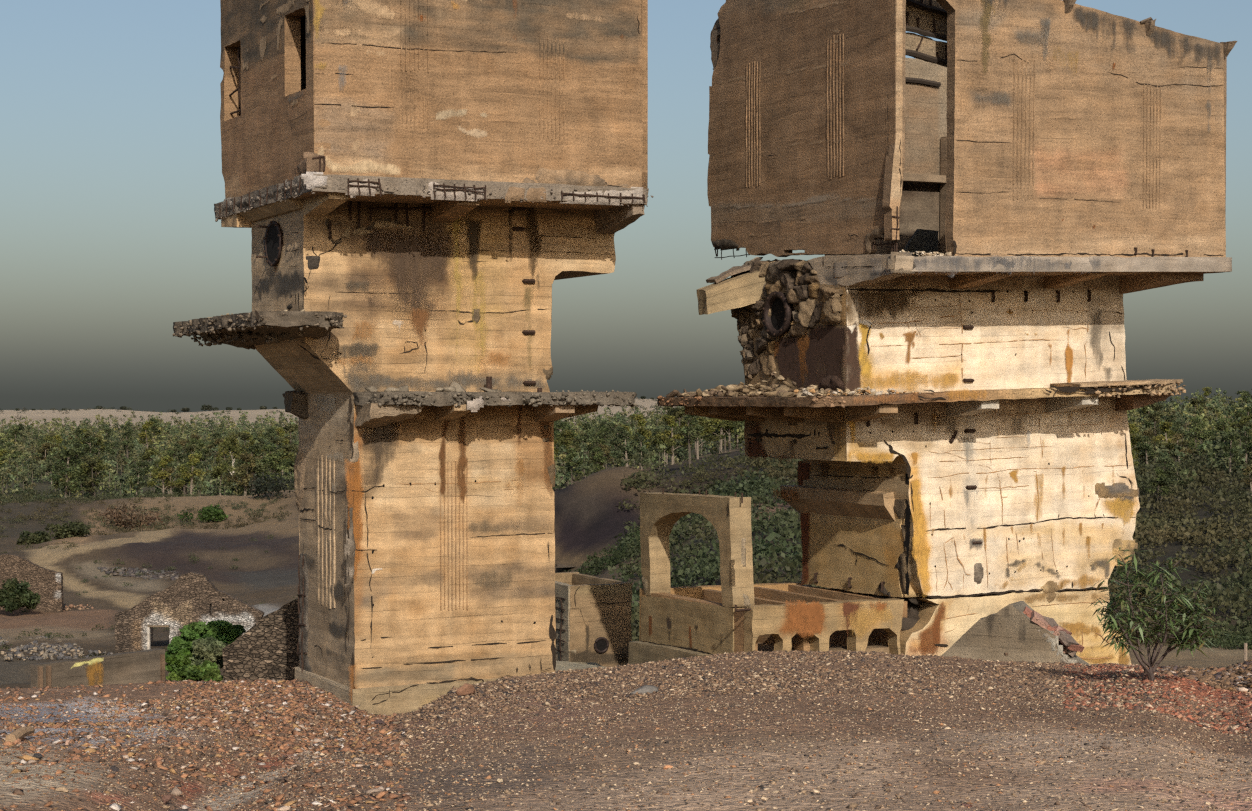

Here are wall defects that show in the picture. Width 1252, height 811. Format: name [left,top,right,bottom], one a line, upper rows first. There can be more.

damp [1075,8,1134,38]
damp [1151,31,1220,60]
spalling [215,141,654,244]
spalling [172,303,347,346]
spalling [306,256,320,270]
damp [366,218,481,308]
spalling [712,195,872,379]
crack [953,240,1224,256]
crack [747,234,1161,659]
rust [784,513,824,636]
rust [911,480,934,594]
rust [920,603,945,655]